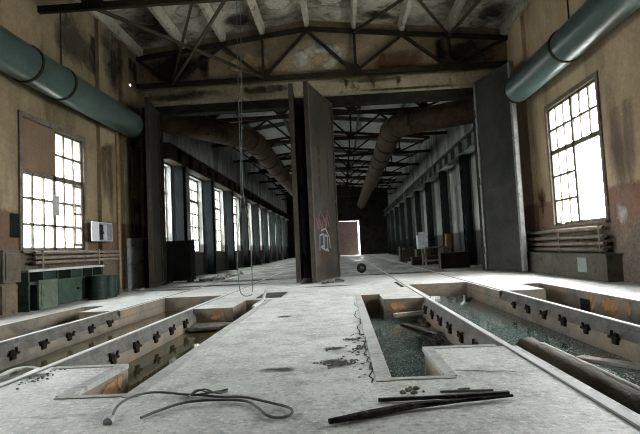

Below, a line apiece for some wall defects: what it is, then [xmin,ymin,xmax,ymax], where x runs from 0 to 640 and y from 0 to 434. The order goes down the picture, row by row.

damp [56,13,95,73]
flaking render [291,43,350,69]
rust [591,295,631,316]
crack [345,303,374,383]
rust [102,375,123,394]